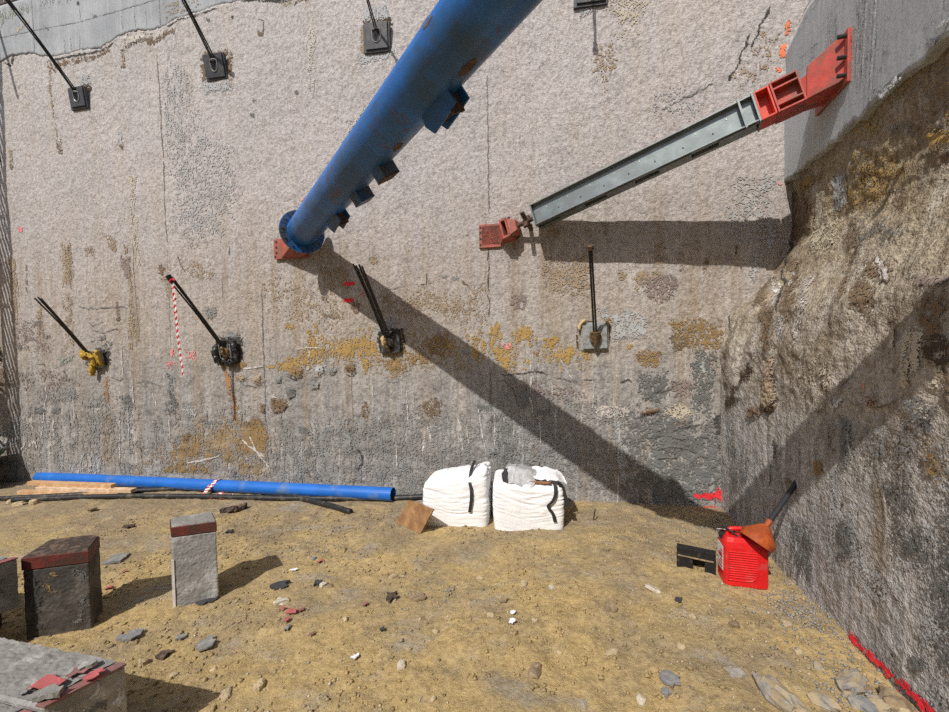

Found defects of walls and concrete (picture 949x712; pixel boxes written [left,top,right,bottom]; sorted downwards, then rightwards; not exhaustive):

crack [671,6,771,106]
corrosion [224,371,238,424]